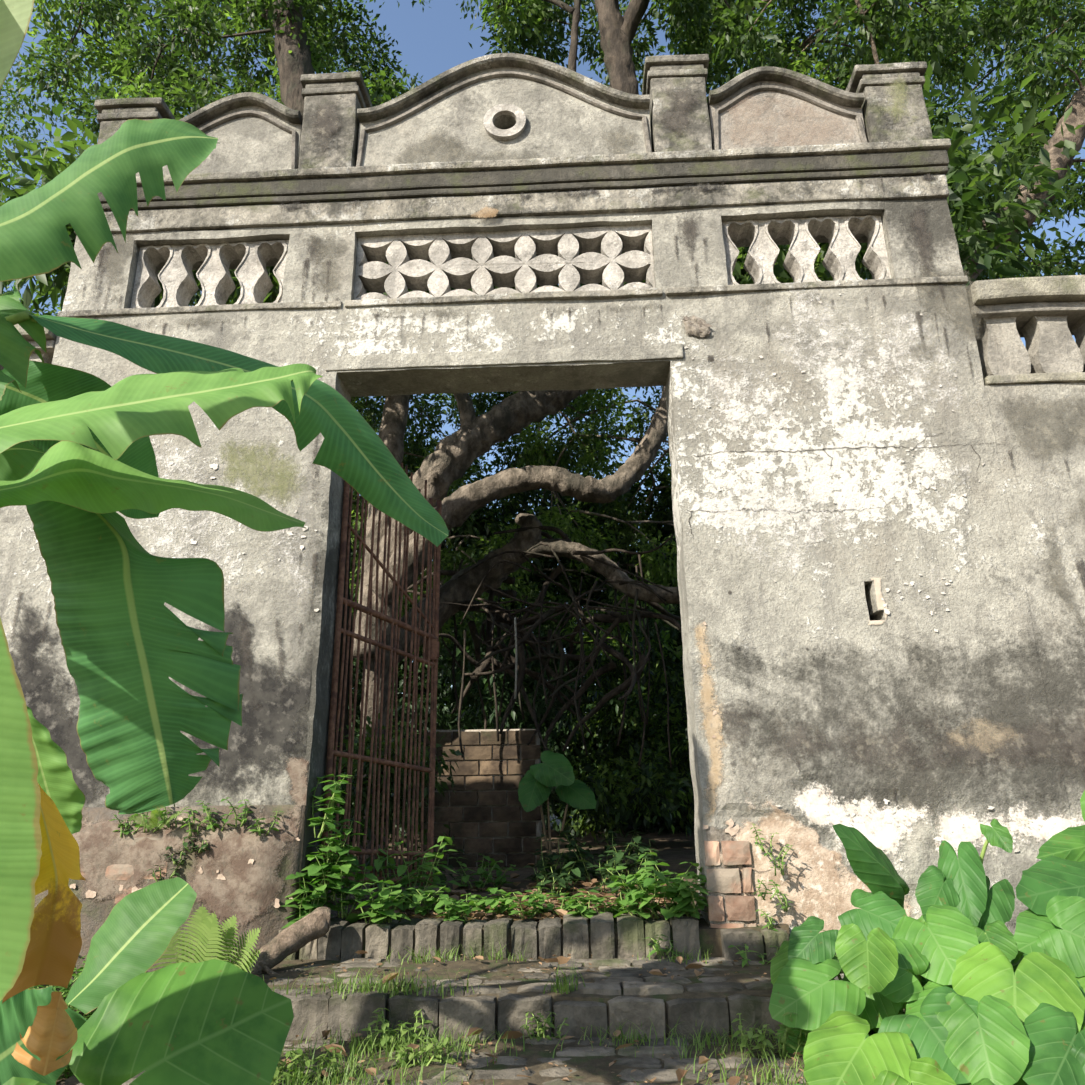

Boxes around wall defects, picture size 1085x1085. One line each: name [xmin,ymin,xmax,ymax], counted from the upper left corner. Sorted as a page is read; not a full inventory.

spalling [682,315,712,360]
peeling [700,355,789,433]
peeling [777,294,958,411]
peeling [708,470,870,568]
water stain [10,592,107,803]
water stain [189,602,311,793]
water stain [718,704,759,745]
spalling [694,621,1085,933]
water stain [773,710,1085,775]